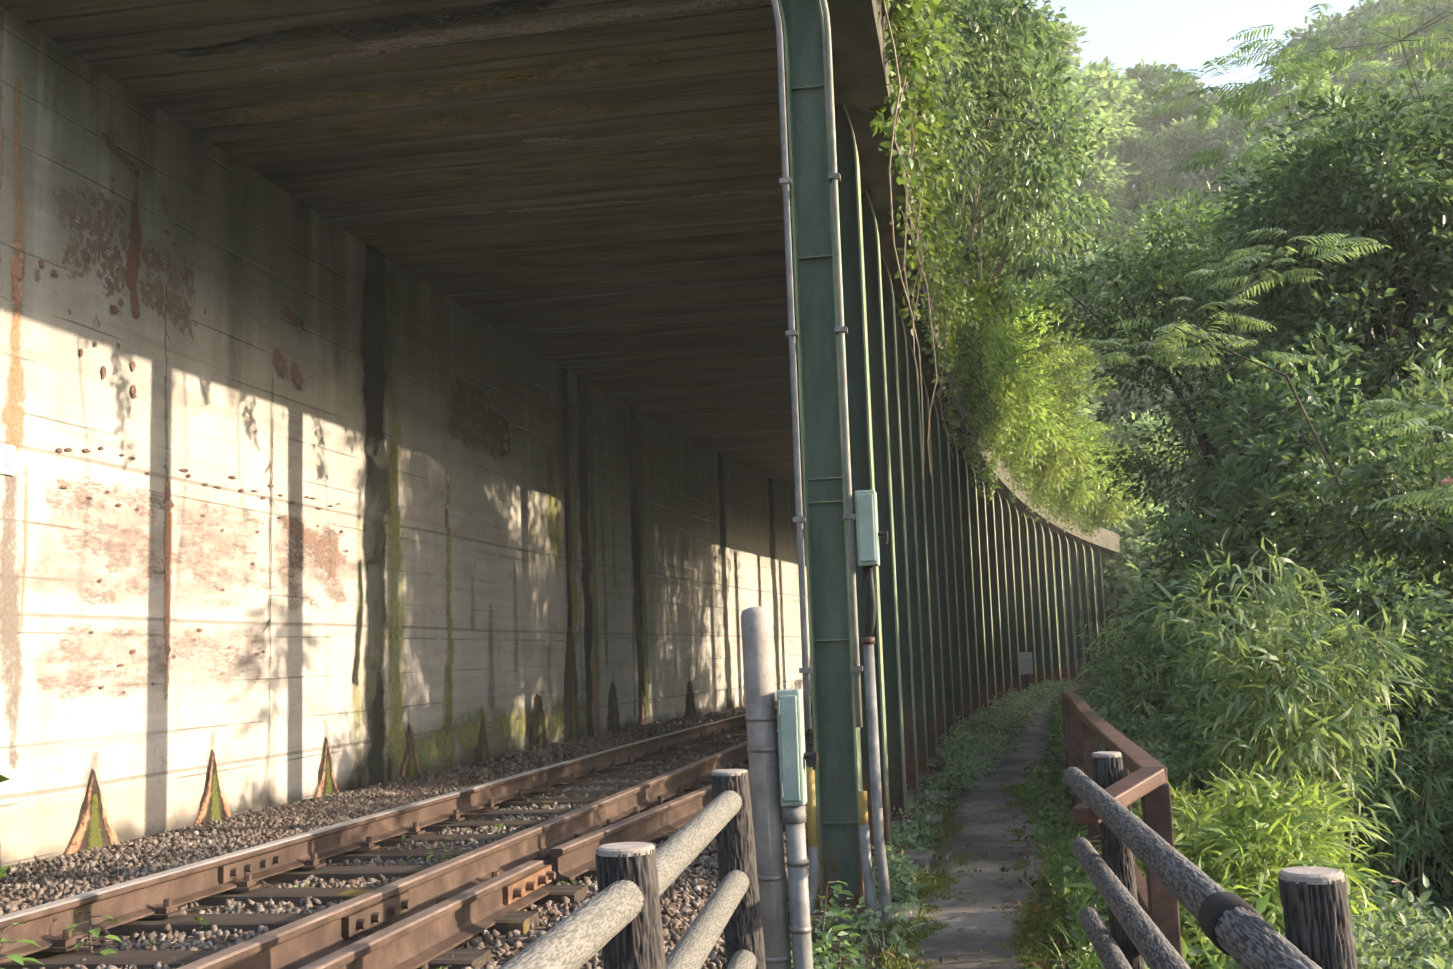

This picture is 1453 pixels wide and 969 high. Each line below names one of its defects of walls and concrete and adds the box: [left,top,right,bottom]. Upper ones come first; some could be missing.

corrosion [3,78,25,449]
spalling [34,127,207,357]
spalling [117,342,136,398]
corrosion [164,481,175,698]
peeling [57,446,349,579]
water stain [348,244,649,790]